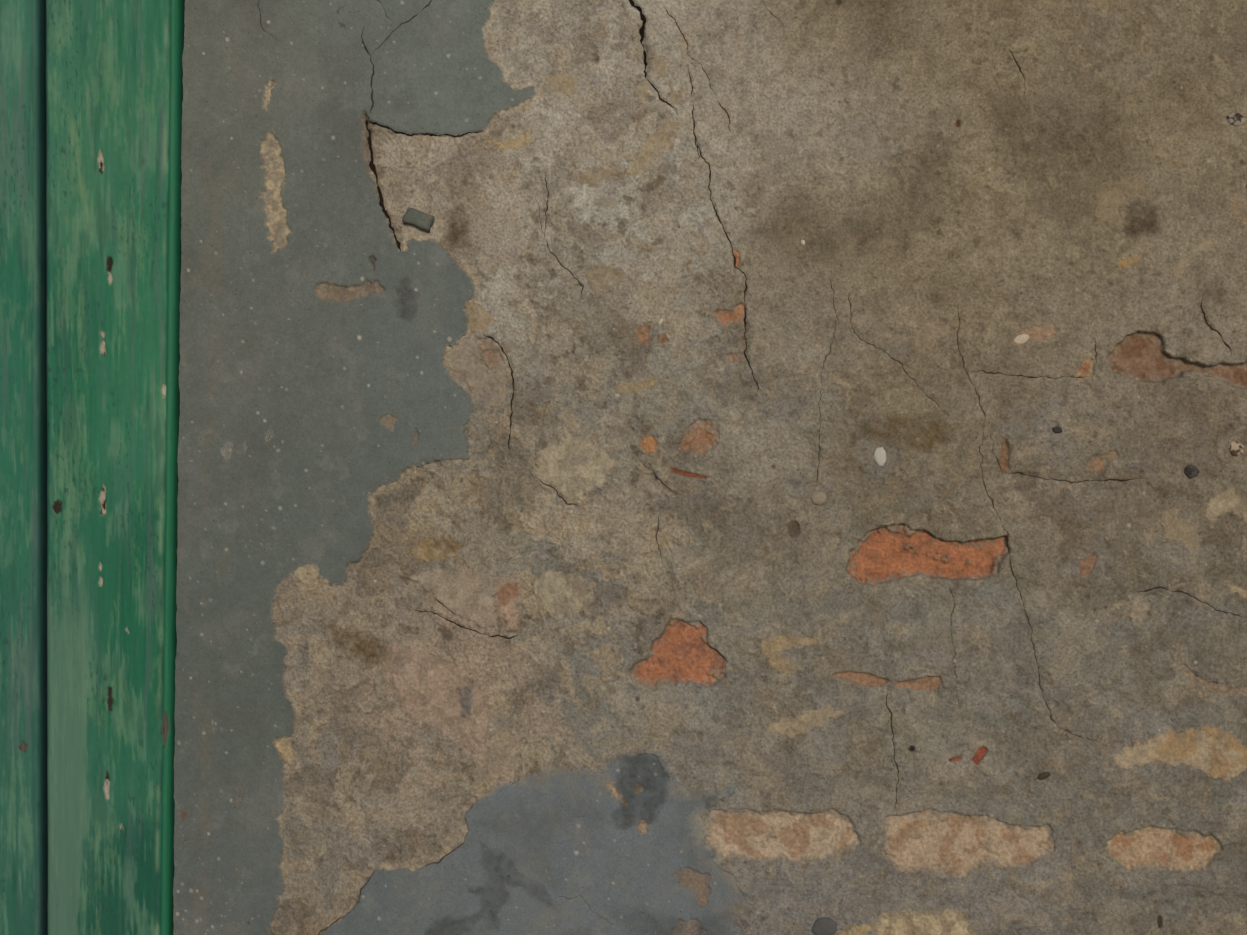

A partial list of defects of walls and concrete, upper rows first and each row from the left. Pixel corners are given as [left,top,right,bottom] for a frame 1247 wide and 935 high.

peeling [260,133,291,254]
crack [361,0,483,251]
crack [629,0,759,397]
peeling [270,0,752,935]
flaking render [846,524,1008,586]
flaking render [1108,332,1247,388]